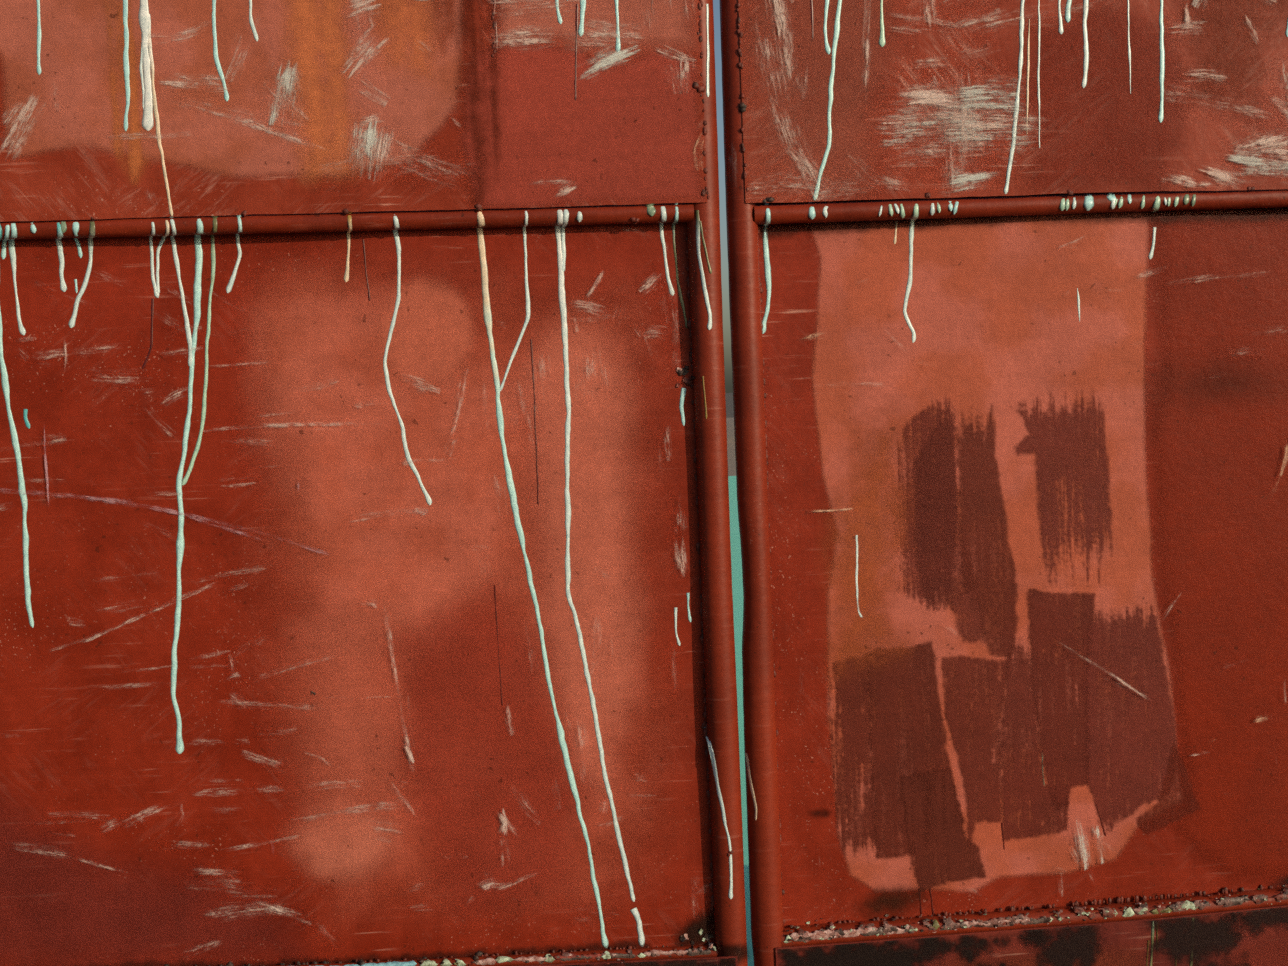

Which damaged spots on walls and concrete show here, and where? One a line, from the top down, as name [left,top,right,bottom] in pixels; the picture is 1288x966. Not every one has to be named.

rust [680,928,717,954]